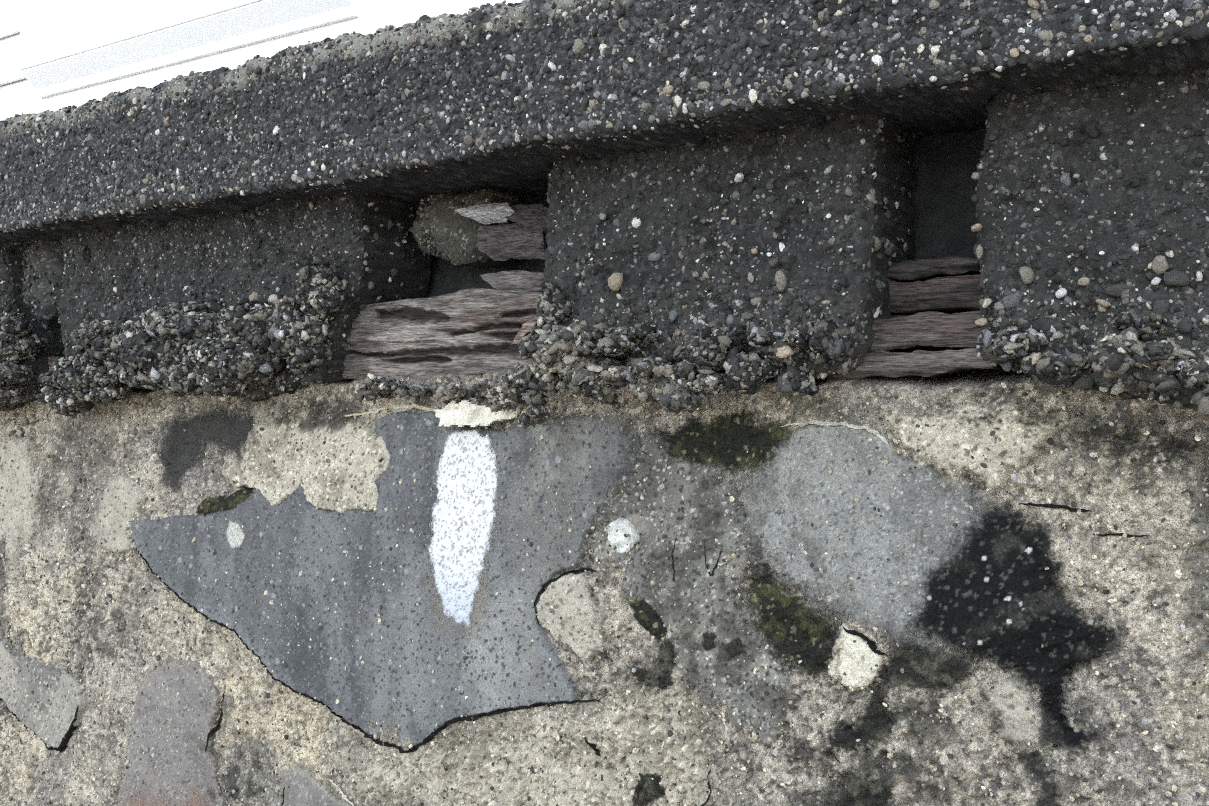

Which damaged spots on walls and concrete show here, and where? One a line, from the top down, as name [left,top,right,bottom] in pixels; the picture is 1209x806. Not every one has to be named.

peeling [0,429,48,568]
damp [158,411,253,489]
peeling [222,400,526,513]
spalling [604,518,640,554]
spalling [537,573,611,661]
damp [913,504,1123,806]